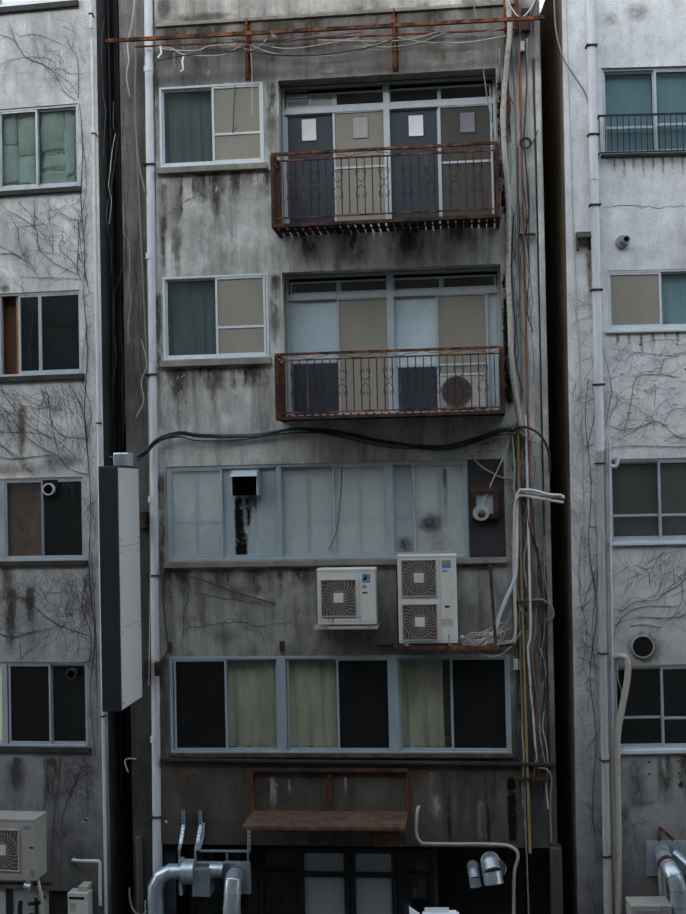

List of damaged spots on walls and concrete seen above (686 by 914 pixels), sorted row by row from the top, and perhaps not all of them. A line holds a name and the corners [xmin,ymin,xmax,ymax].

water stain [161,170,271,263]
water stain [507,769,526,841]